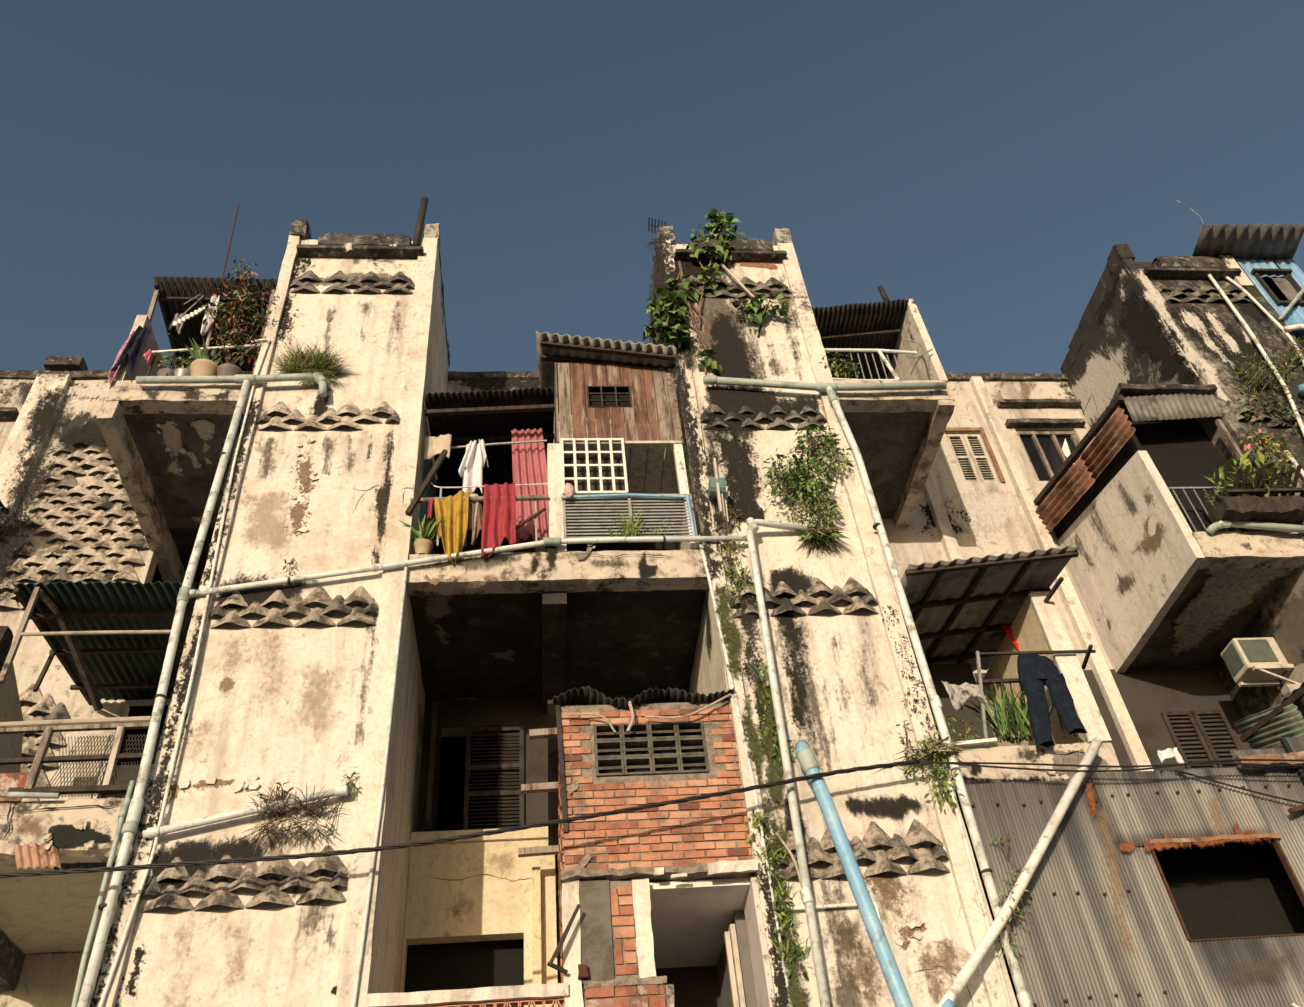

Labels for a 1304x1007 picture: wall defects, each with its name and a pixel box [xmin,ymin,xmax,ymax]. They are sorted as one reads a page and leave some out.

damp [0,382,110,594]
peeling [153,417,216,476]
damp [648,234,824,755]
damp [1071,267,1285,425]
damp [89,399,318,1007]
spalling [42,818,110,850]
damp [753,794,807,1007]
rust [1086,781,1270,946]